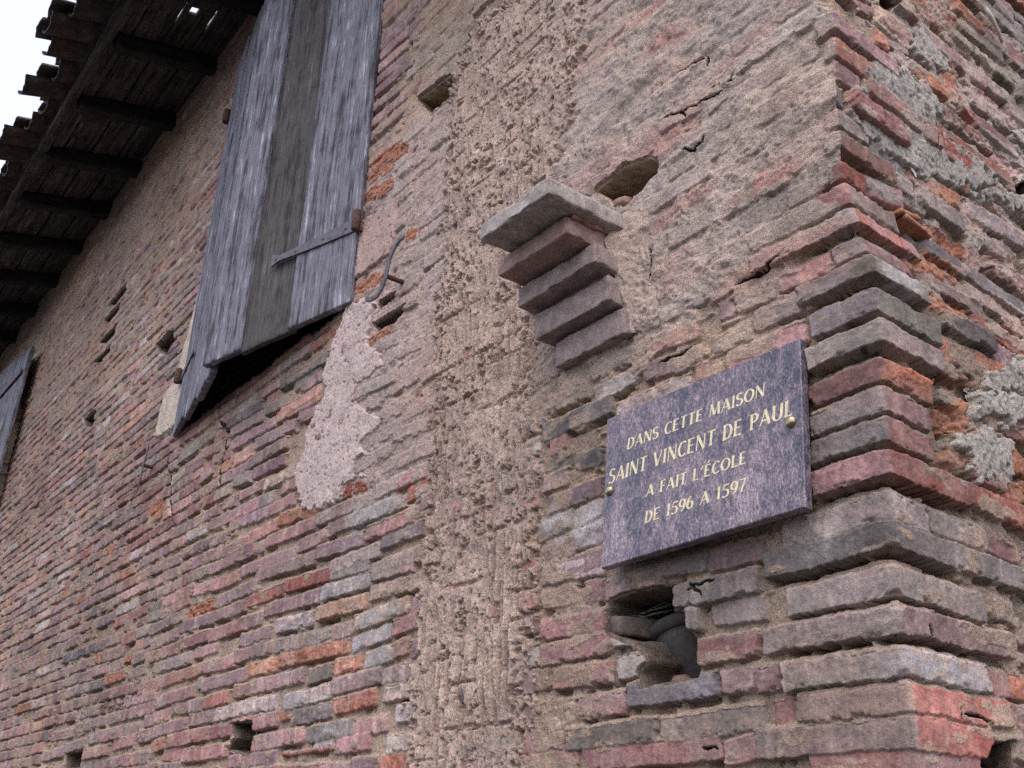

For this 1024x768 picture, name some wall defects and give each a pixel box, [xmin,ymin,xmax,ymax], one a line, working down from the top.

crack [664,57,734,118]
crack [681,136,704,152]
crack [736,255,778,285]
spalling [342,481,370,499]